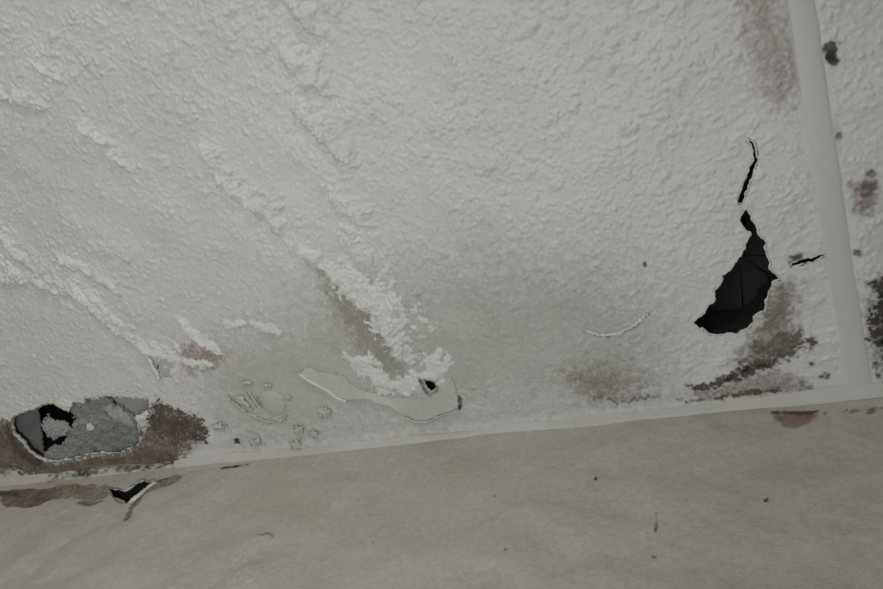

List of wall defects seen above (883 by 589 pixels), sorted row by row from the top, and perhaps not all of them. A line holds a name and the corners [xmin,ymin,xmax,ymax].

crack [737,138,759,204]
crack [789,252,826,267]
water stain [686,283,818,403]
water stain [864,276,883,361]
spalling [10,387,150,463]
peeling [298,367,462,424]
spalling [108,479,157,504]